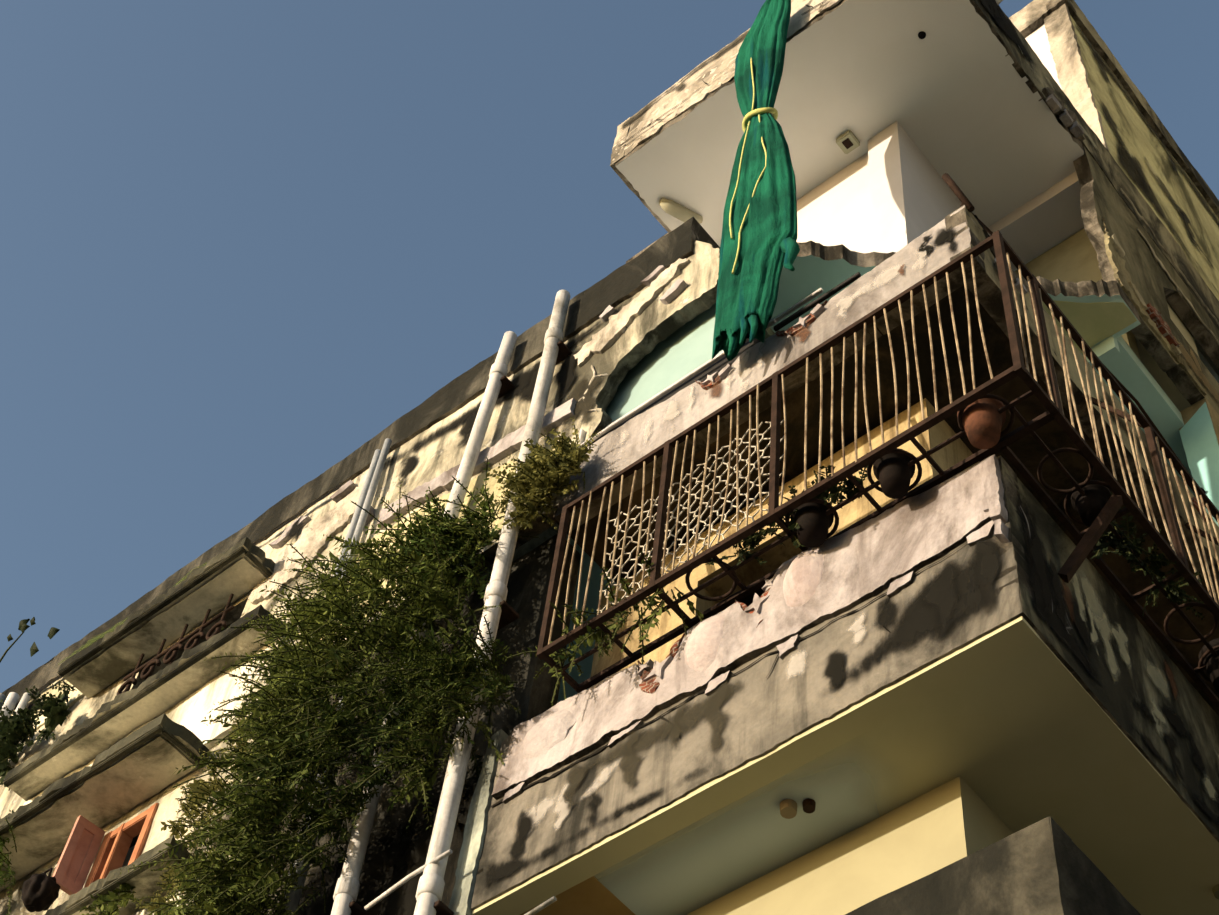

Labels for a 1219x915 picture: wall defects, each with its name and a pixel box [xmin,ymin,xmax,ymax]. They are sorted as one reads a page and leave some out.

water stain [621,30,749,129]
water stain [981,0,1033,70]
mould [1102,102,1213,268]
peeling [573,258,691,367]
spalling [694,364,734,390]
water stain [1102,392,1153,464]
flaking render [491,454,1030,804]
water stain [788,653,804,675]
water stain [823,539,1000,689]
water stain [1019,492,1130,678]
water stain [485,681,740,887]
water stain [1134,664,1219,825]